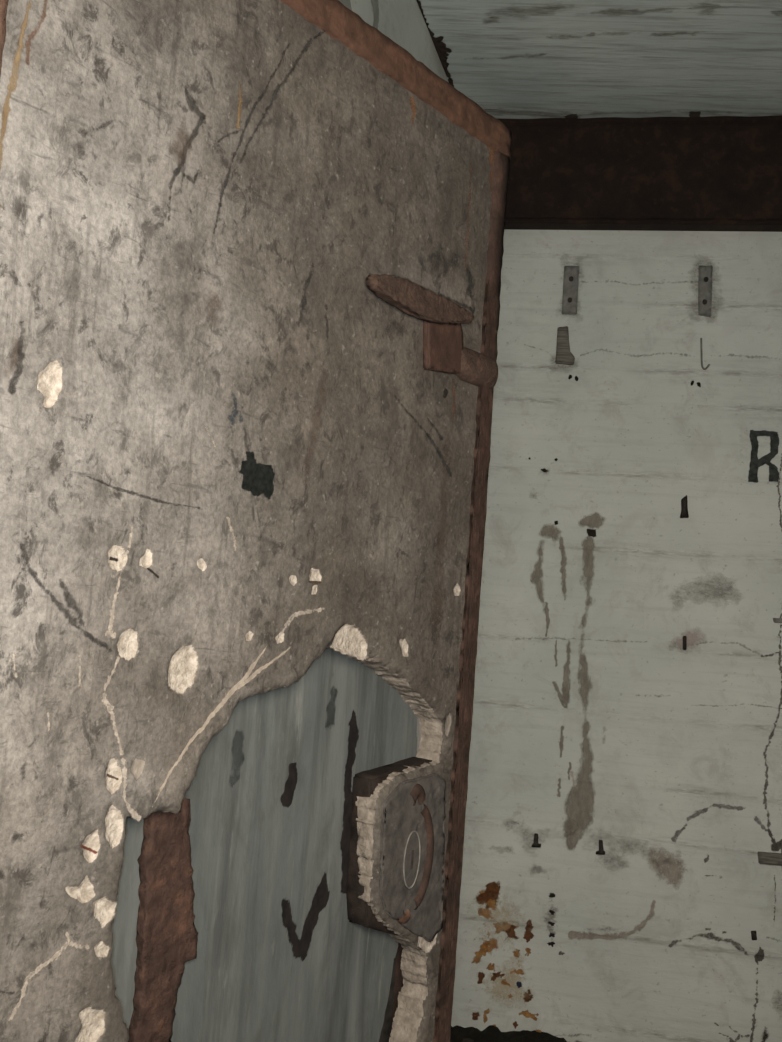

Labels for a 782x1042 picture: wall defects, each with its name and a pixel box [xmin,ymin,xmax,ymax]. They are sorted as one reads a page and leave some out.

crack [774,457,782,527]
crack [101,526,141,821]
spalling [168,645,198,694]
crack [280,607,324,634]
spalling [324,624,452,1042]
leakage [531,512,604,708]
leakage [557,722,594,850]
crack [758,614,782,851]
crack [8,932,90,1021]
corrosion [128,798,198,1042]
corrosion [472,881,541,1032]
crack [750,947,764,1042]